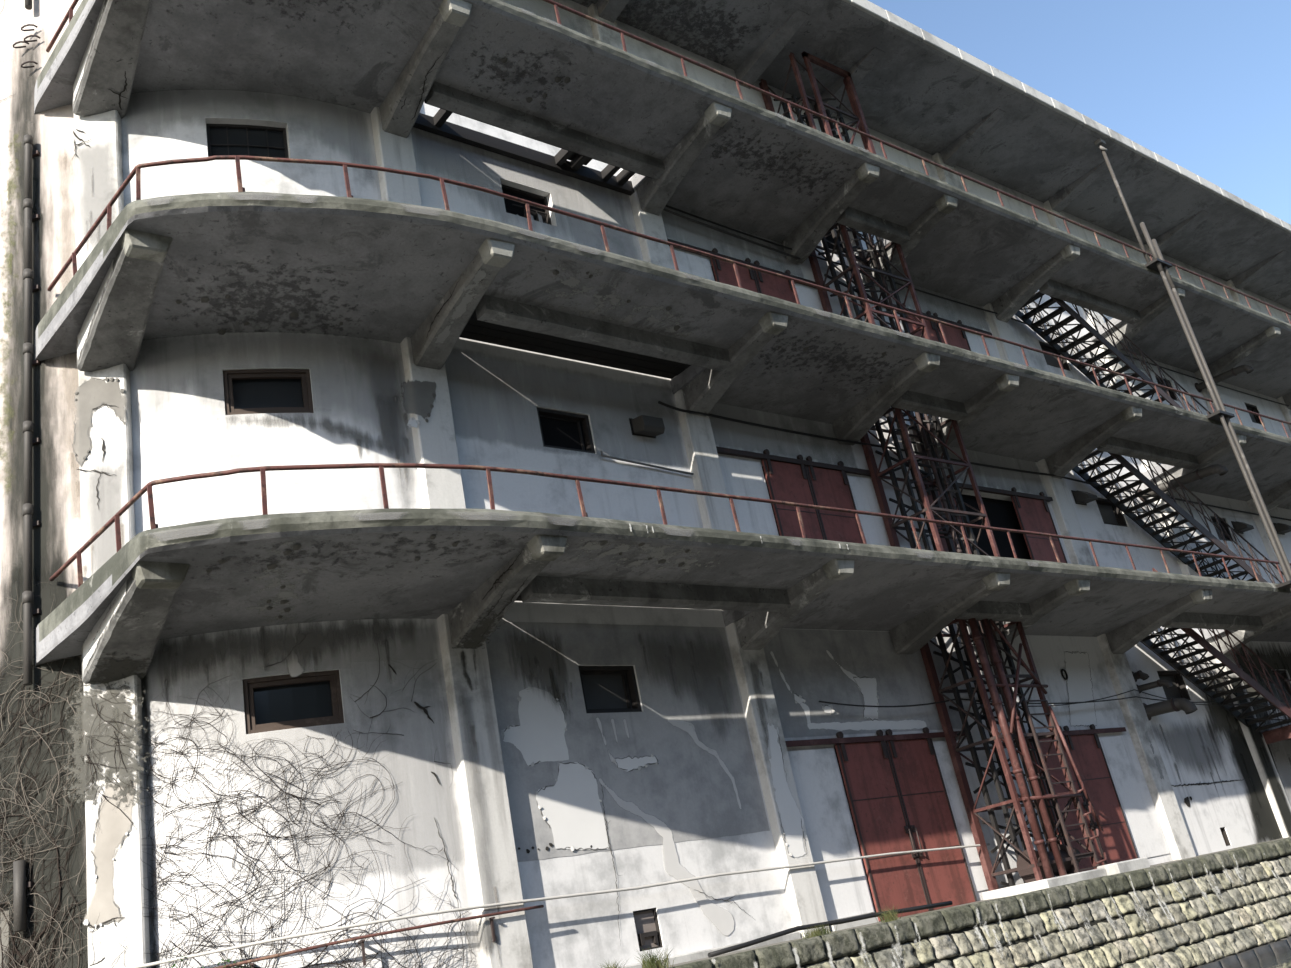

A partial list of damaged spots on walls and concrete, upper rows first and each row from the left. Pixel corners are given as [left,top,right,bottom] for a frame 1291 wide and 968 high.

crack [77,404,119,509]
peeling [72,377,127,467]
water stain [0,42,413,968]
crack [414,702,434,723]
peeling [770,650,927,731]
peeling [501,686,609,853]
peeling [83,779,136,929]
crack [434,818,472,951]
water stain [891,923,920,968]
water stain [974,904,1010,957]
water stain [1104,872,1175,927]
water stain [1168,855,1244,910]